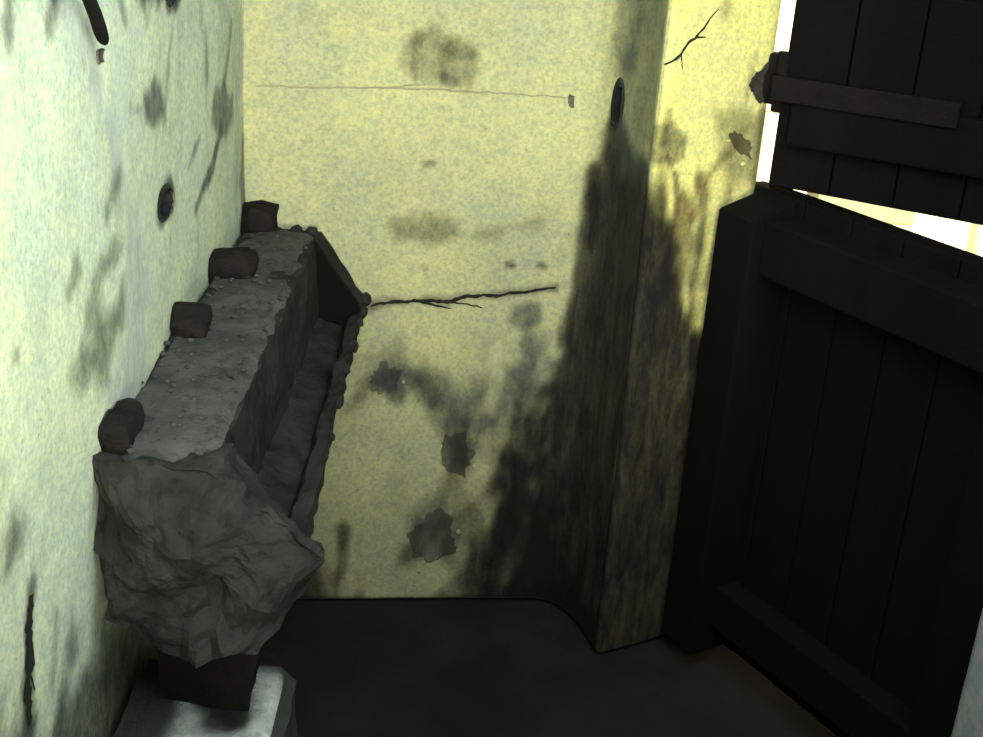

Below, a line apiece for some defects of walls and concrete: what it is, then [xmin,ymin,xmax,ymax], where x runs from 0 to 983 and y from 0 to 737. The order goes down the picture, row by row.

crack [664,9,719,70]
leakage [695,221,704,260]
crack [371,287,556,309]
leakage [383,53,702,652]
crack [24,584,36,735]